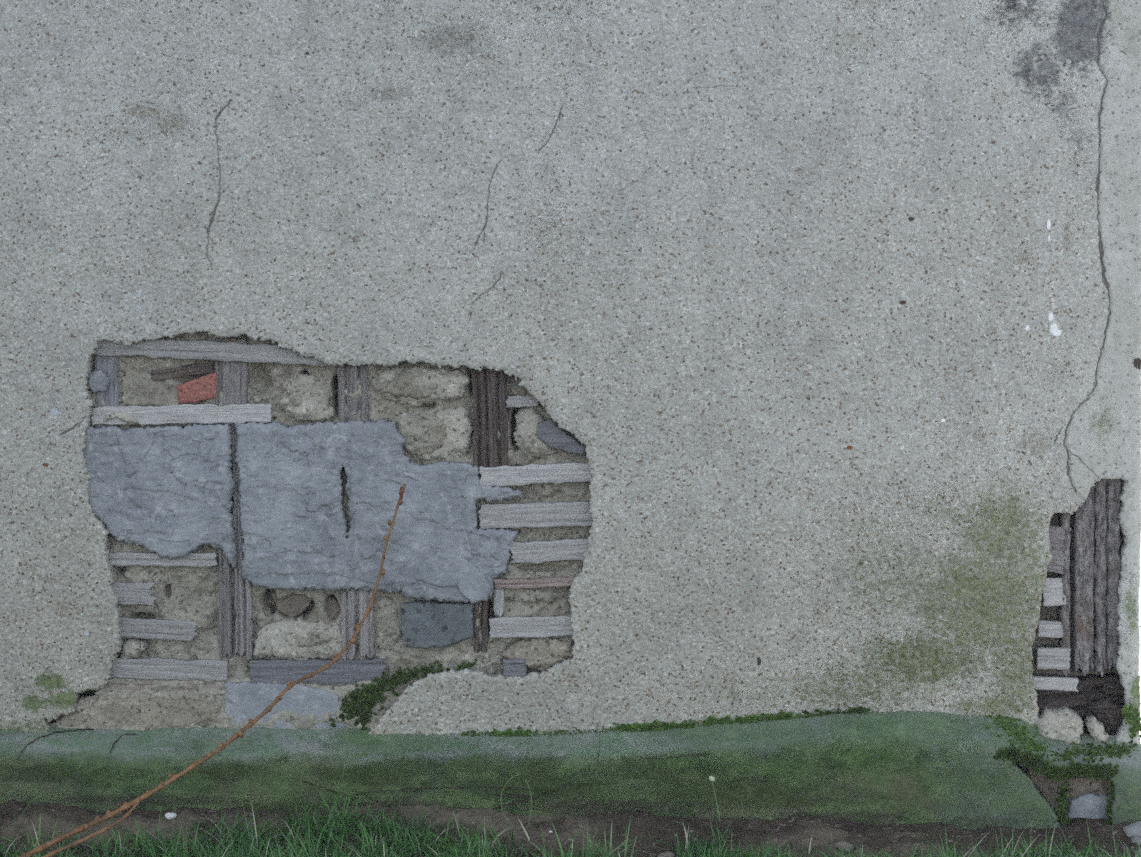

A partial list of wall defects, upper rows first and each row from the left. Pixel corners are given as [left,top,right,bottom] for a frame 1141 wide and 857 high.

crack [206,99,232,270]
damp [998,0,1039,25]
damp [1013,0,1111,115]
crack [1054,0,1111,492]
spalling [50,332,593,730]
spalling [1032,479,1125,744]